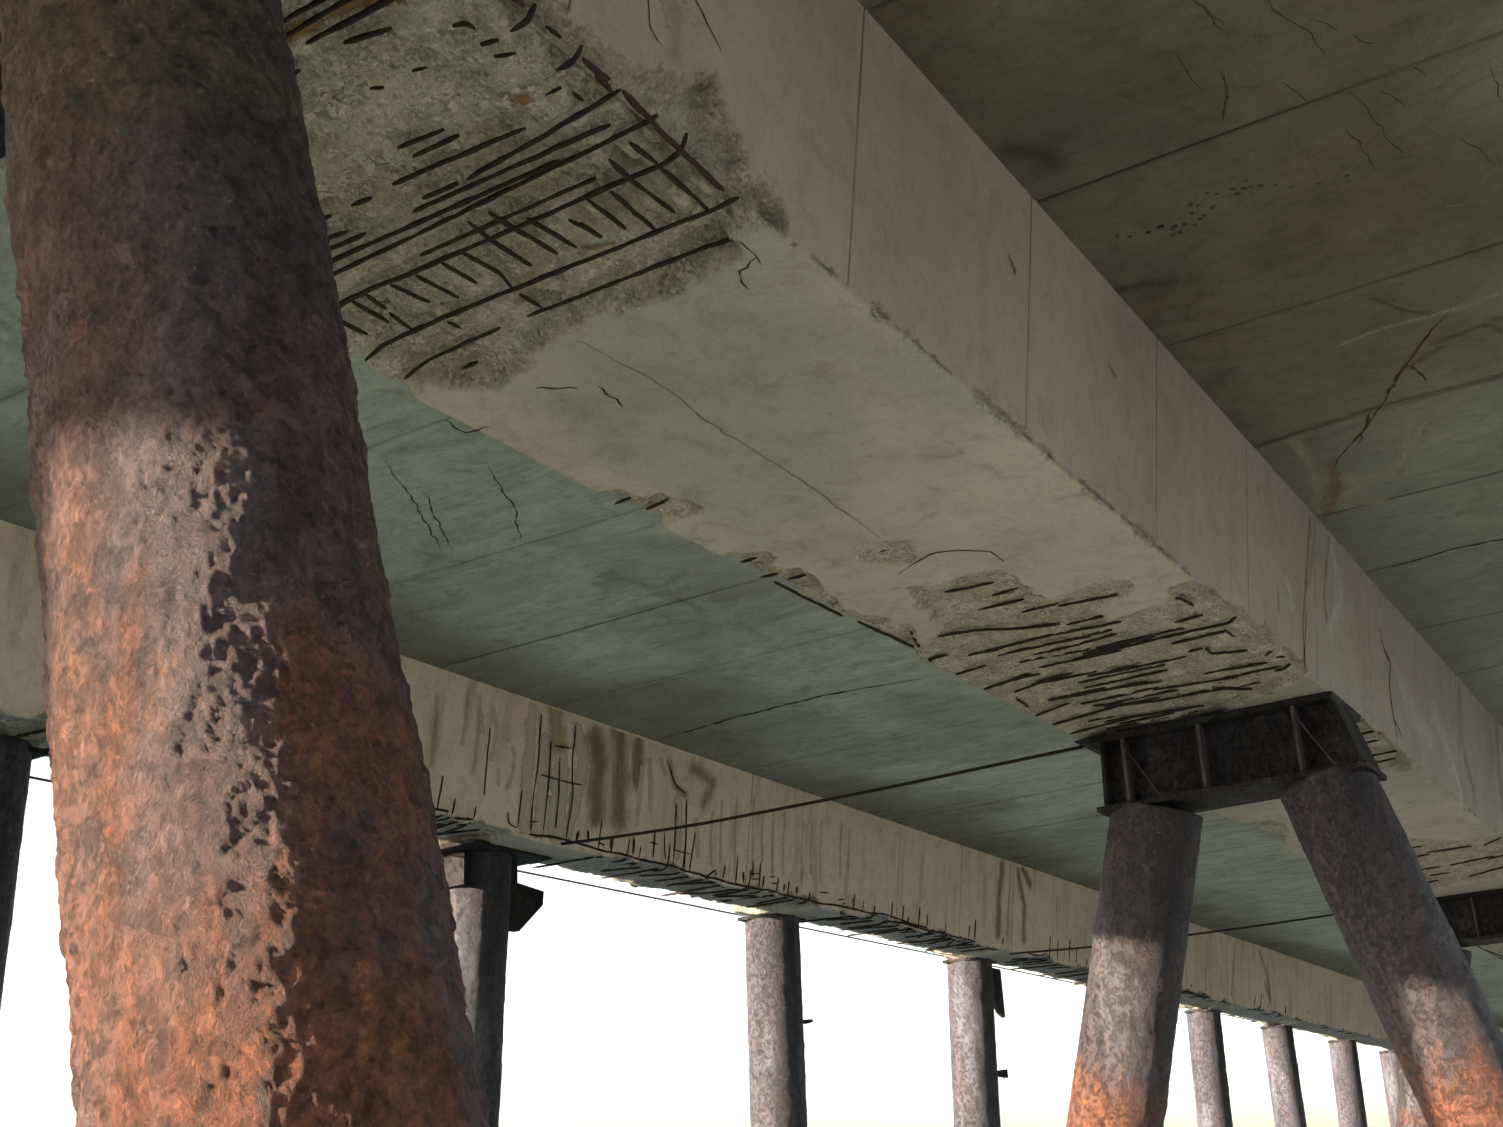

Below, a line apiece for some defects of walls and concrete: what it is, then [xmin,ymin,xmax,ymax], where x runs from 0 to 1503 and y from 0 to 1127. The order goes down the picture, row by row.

crack [696,0,722,52]
crack [1268,0,1375,56]
crack [1345,66,1427,167]
spalling [281,0,1311,740]
crack [1334,307,1452,468]
crack [385,461,453,554]
crack [488,467,521,540]
spalling [0,706,50,757]
leakage [590,729,643,828]
spalling [1357,716,1415,773]
spalling [435,703,1089,987]
spalling [1408,832,1503,891]